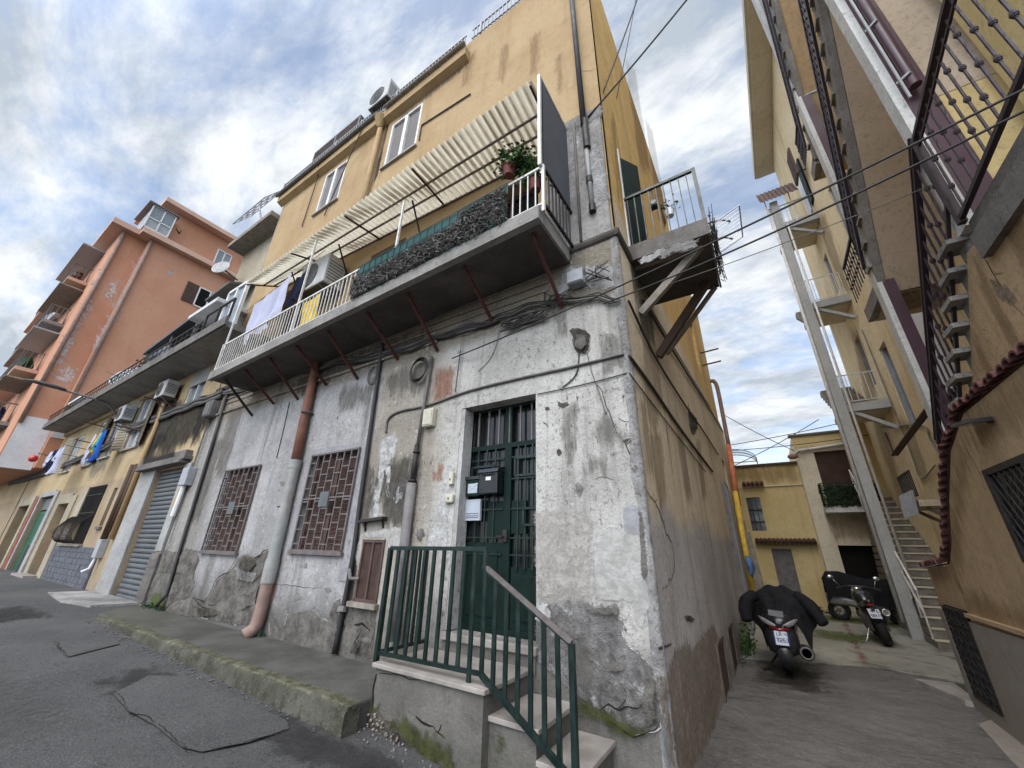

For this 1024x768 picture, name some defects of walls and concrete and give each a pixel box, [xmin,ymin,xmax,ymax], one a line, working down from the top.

spalling [638,239,698,264]
peeling [49,257,145,387]
spalling [569,328,591,355]
corrosion [435,369,453,398]
leakage [143,397,213,464]
crack [597,385,630,454]
peeling [371,435,403,518]
spalling [147,549,269,626]
crack [115,692,281,753]
crack [415,716,445,739]
crack [599,690,656,738]